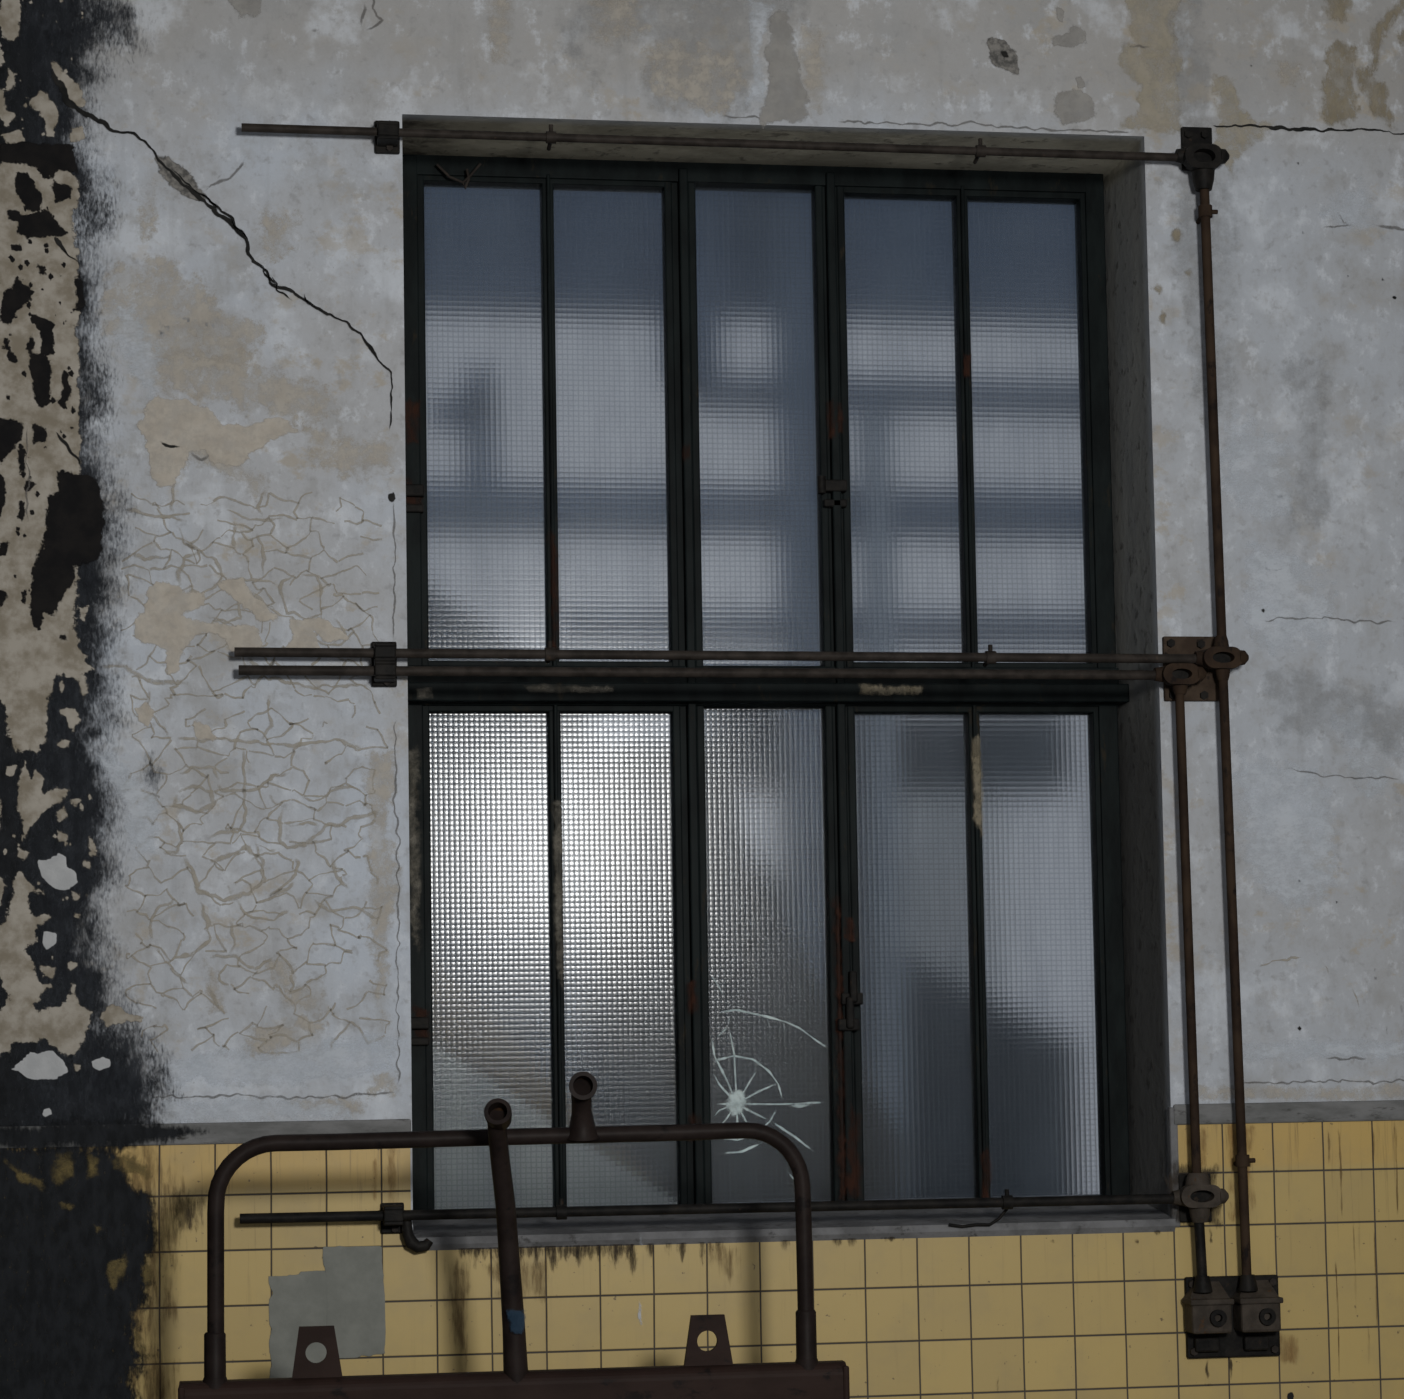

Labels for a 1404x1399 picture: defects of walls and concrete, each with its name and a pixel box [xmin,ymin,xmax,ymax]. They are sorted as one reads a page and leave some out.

leakage [1322,0,1404,126]
crack [1214,124,1404,135]
crack [51,71,393,429]
peeling [137,348,391,487]
peeling [0,0,143,1080]
peeling [134,577,349,674]
leakage [1243,548,1330,653]
crack [108,488,400,1099]
leakage [1234,755,1336,904]
peeling [269,1246,386,1378]
leakage [519,1243,653,1288]